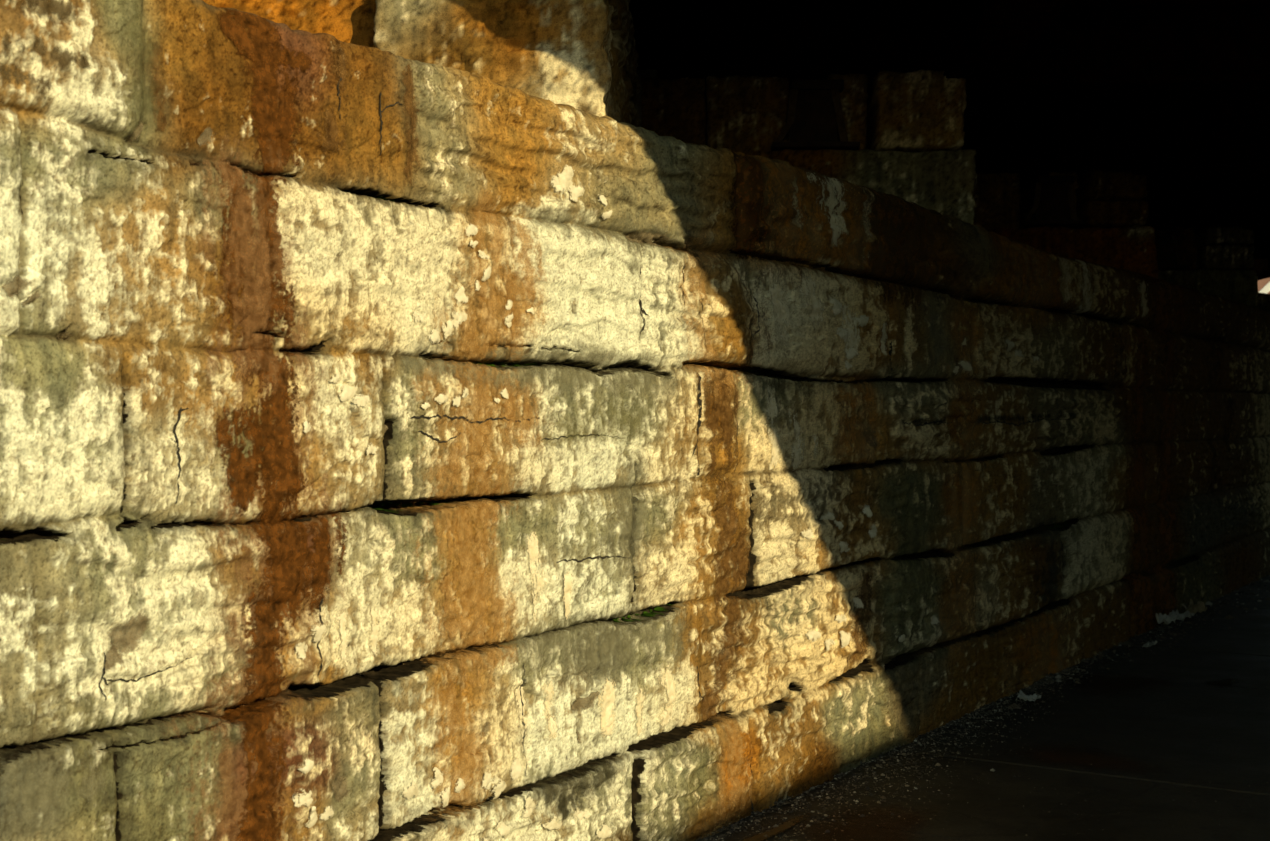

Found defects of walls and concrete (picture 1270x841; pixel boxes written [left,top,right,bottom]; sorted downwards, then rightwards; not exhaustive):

rust [402,65,420,185]
crack [173,407,189,504]
rust [213,7,348,841]
rust [401,192,544,812]
crack [411,414,619,443]
rust [678,232,764,840]
rust [847,569,873,666]